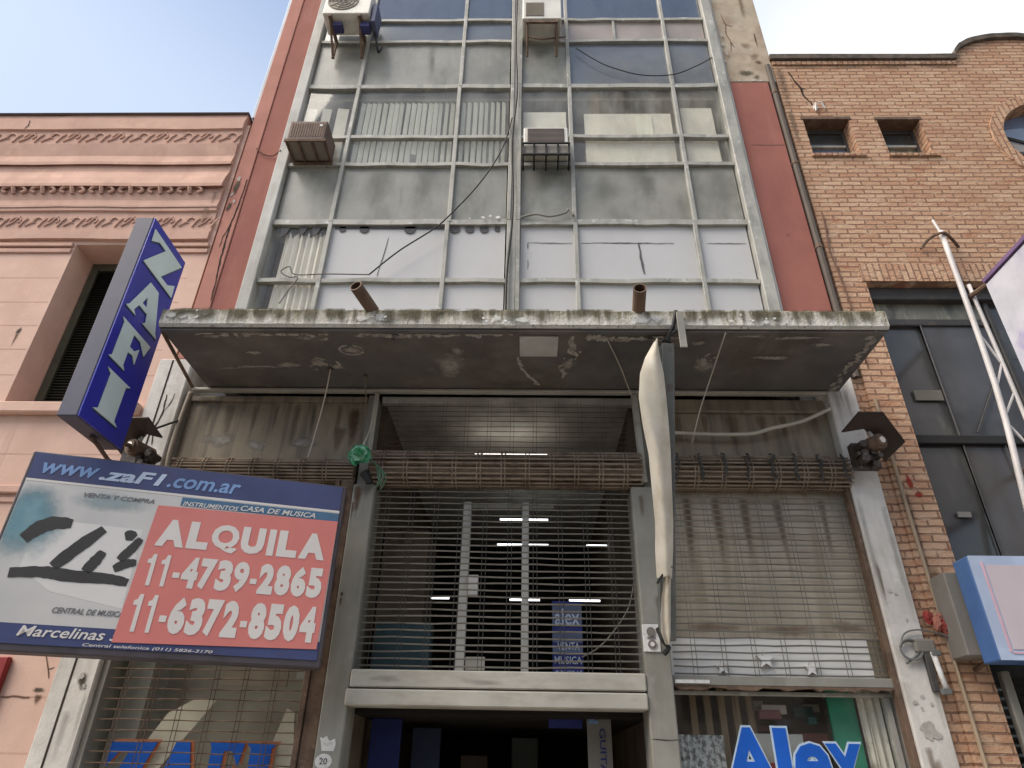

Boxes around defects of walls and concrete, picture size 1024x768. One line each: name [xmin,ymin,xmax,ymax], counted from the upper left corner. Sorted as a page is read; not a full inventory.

crack [788,72,813,106]
crack [211,179,248,299]
leakage [304,309,357,320]
leakage [385,309,549,323]
leakage [567,309,612,320]